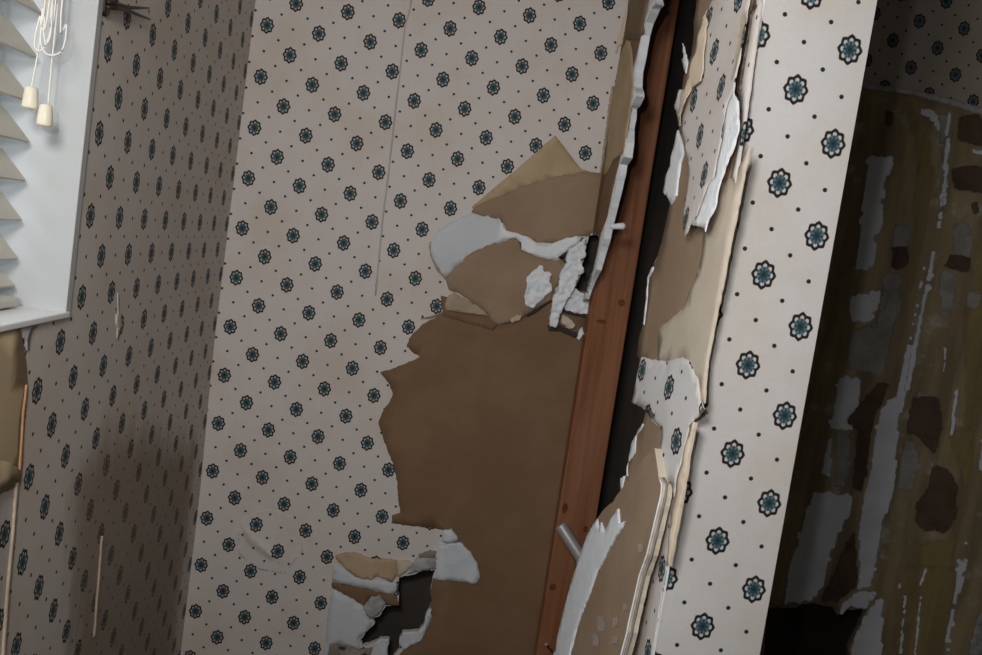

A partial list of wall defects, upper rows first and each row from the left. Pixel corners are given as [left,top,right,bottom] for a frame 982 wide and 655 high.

damp [958,114,982,146]
damp [952,166,982,214]
damp [848,383,889,491]
damp [896,249,982,655]
spalling [323,550,436,655]
damp [822,533,858,602]